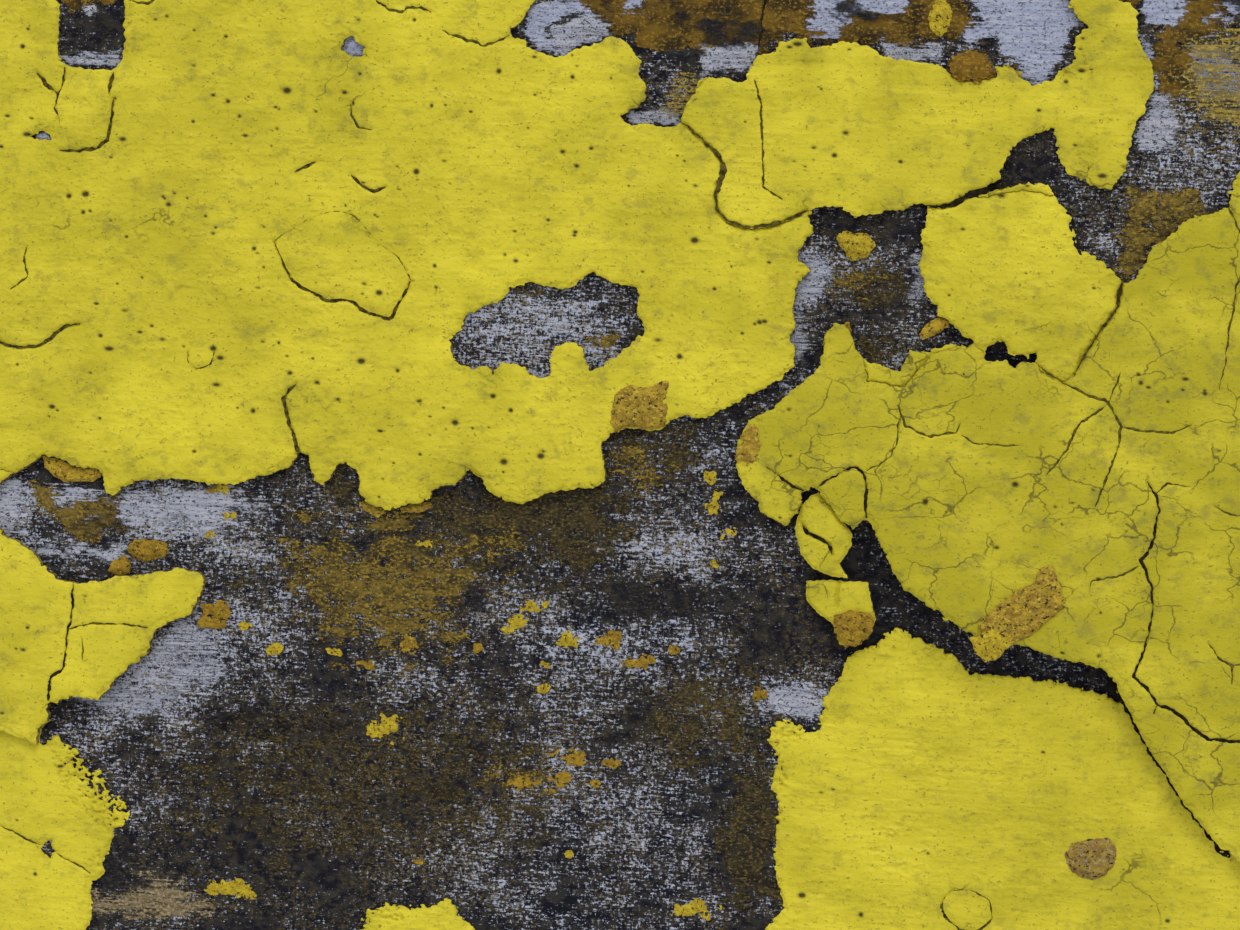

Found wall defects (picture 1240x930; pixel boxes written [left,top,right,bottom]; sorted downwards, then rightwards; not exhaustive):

peeling [57,0,126,70]
peeling [511,0,1240,446]
crack [926,183,1009,209]
crack [0,323,79,349]
peeling [450,272,645,378]
crack [1041,282,1191,507]
crack [1219,277,1240,388]
crack [47,582,148,701]
peeling [0,399,877,930]
crack [767,406,1240,858]